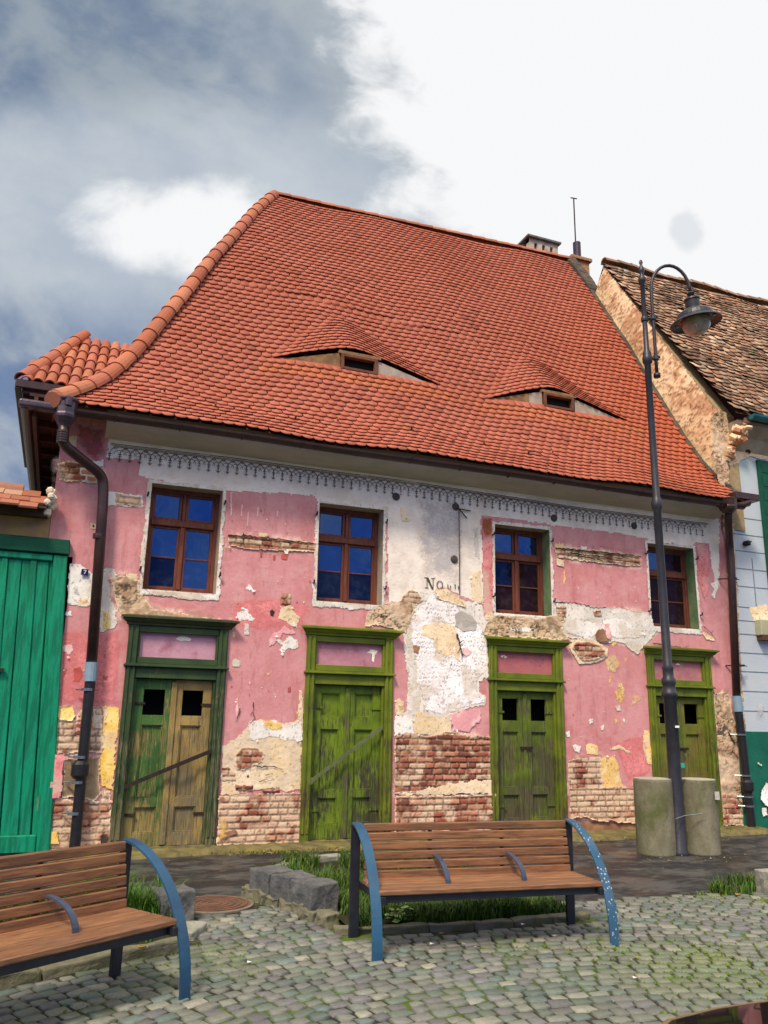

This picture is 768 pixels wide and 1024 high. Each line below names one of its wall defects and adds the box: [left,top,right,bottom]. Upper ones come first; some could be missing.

spalling [54,455,109,483]
flaking render [65,563,254,635]
spalling [224,532,316,554]
spalling [554,545,642,568]
spalling [50,705,119,850]
spalling [216,690,304,846]
spalling [364,588,657,832]
flaking render [714,519,746,826]